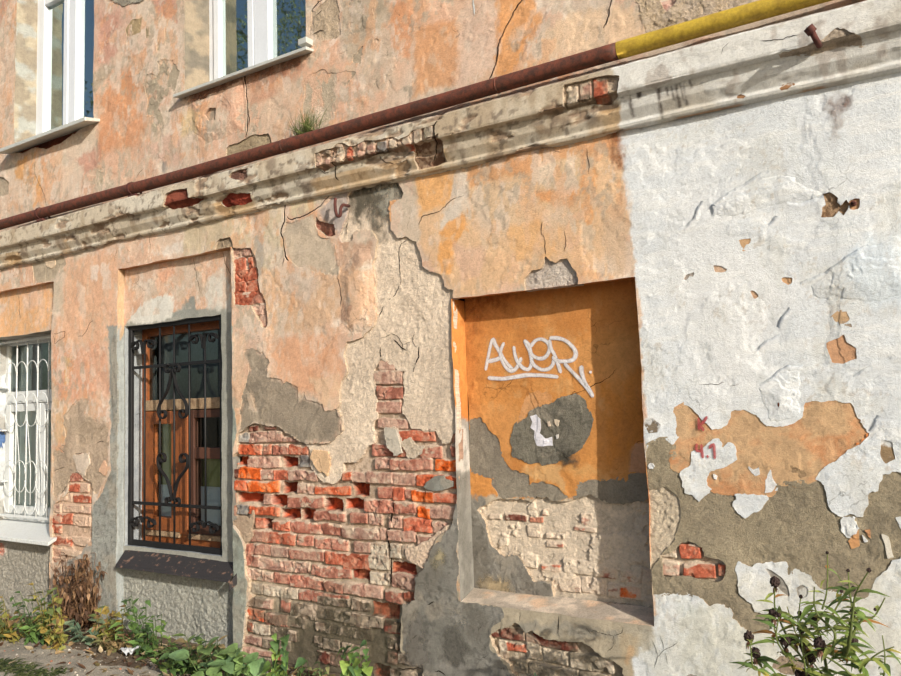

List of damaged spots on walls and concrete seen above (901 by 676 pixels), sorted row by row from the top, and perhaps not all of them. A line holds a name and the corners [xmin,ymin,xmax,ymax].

crack [489,0,524,79]
flaking render [635,0,747,33]
crack [242,76,250,138]
spalling [316,126,447,171]
flaking render [0,177,9,196]
spalling [222,193,253,207]
crack [279,149,350,262]
peeling [679,170,796,234]
flaking render [215,238,268,328]
flaking render [234,183,901,676]
flaking render [49,396,110,613]